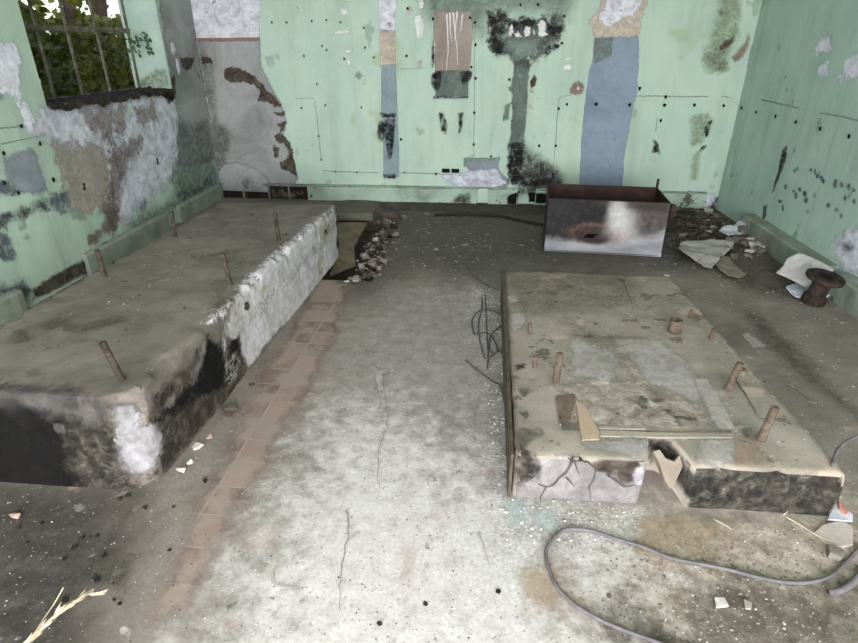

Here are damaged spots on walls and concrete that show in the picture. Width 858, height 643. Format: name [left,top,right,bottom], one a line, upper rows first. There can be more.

peeling [0,41,212,236]
spalling [224,67,297,176]
leakage [486,12,562,189]
leakage [64,405,163,474]
crack [377,407,389,488]
crack [538,455,635,502]
crack [338,510,350,613]